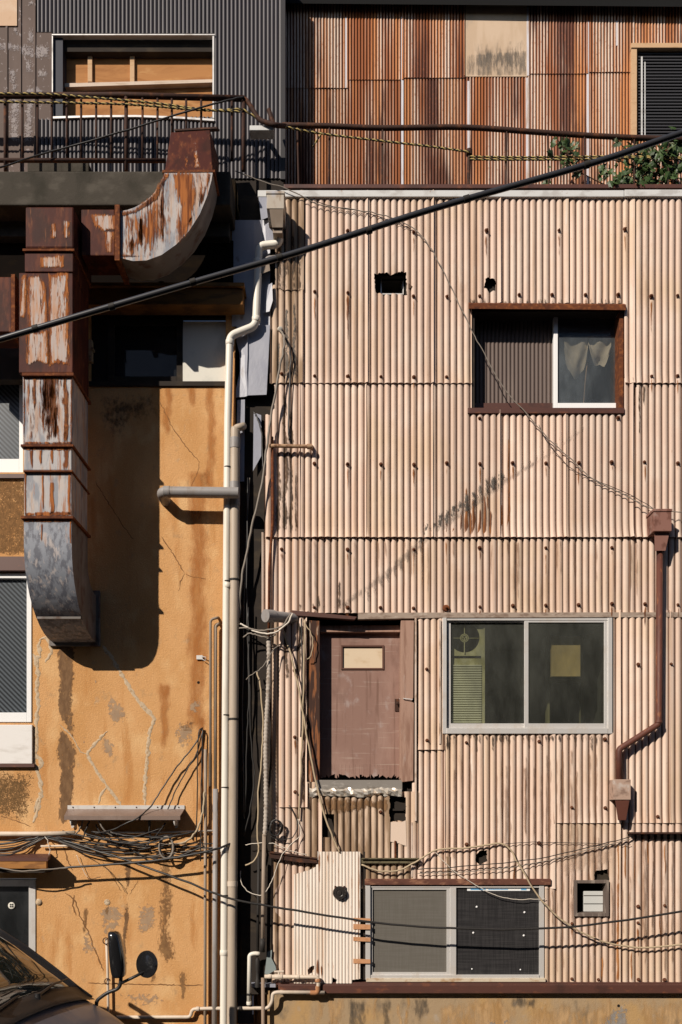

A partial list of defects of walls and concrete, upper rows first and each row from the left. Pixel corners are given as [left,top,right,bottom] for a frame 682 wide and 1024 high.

water stain [469,52,525,75]
corrosion [92,152,210,257]
corrosion [20,254,72,543]
crack [160,402,199,484]
corrosion [445,440,514,548]
crack [162,537,205,591]
water stain [57,647,76,824]
crack [1,636,156,826]
water stain [0,771,35,820]
water stain [159,860,174,961]